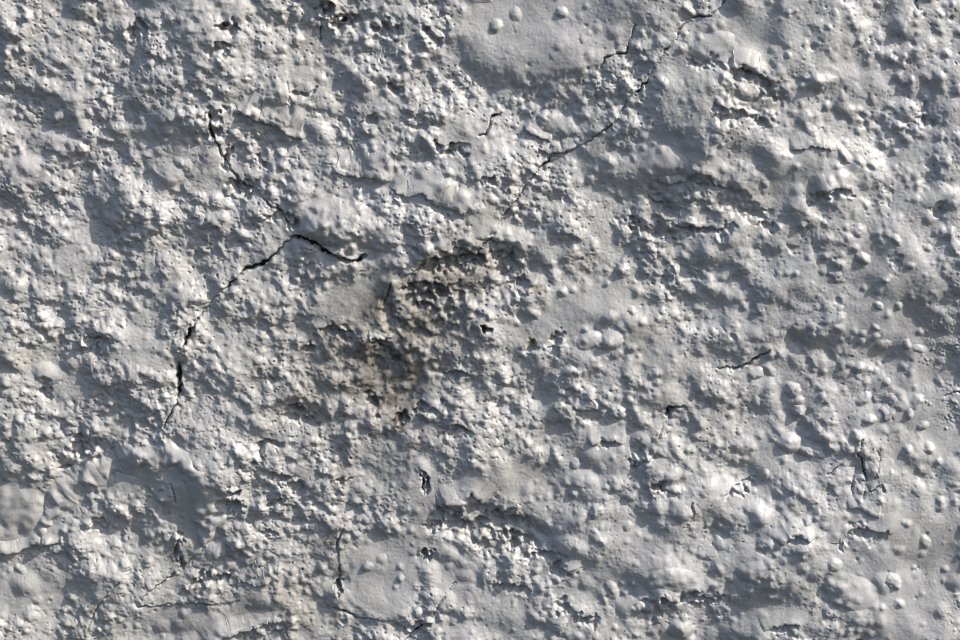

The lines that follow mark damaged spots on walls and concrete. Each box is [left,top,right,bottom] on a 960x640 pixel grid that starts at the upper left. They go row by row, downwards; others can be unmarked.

crack [209,113,364,291]
crack [162,310,204,442]